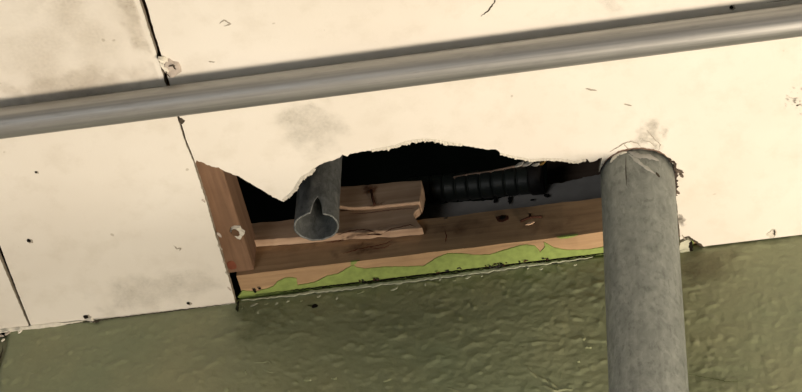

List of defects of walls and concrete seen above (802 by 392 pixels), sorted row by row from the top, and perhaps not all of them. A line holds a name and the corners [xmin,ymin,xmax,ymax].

crack [610,130,661,152]
peeling [241,257,592,314]